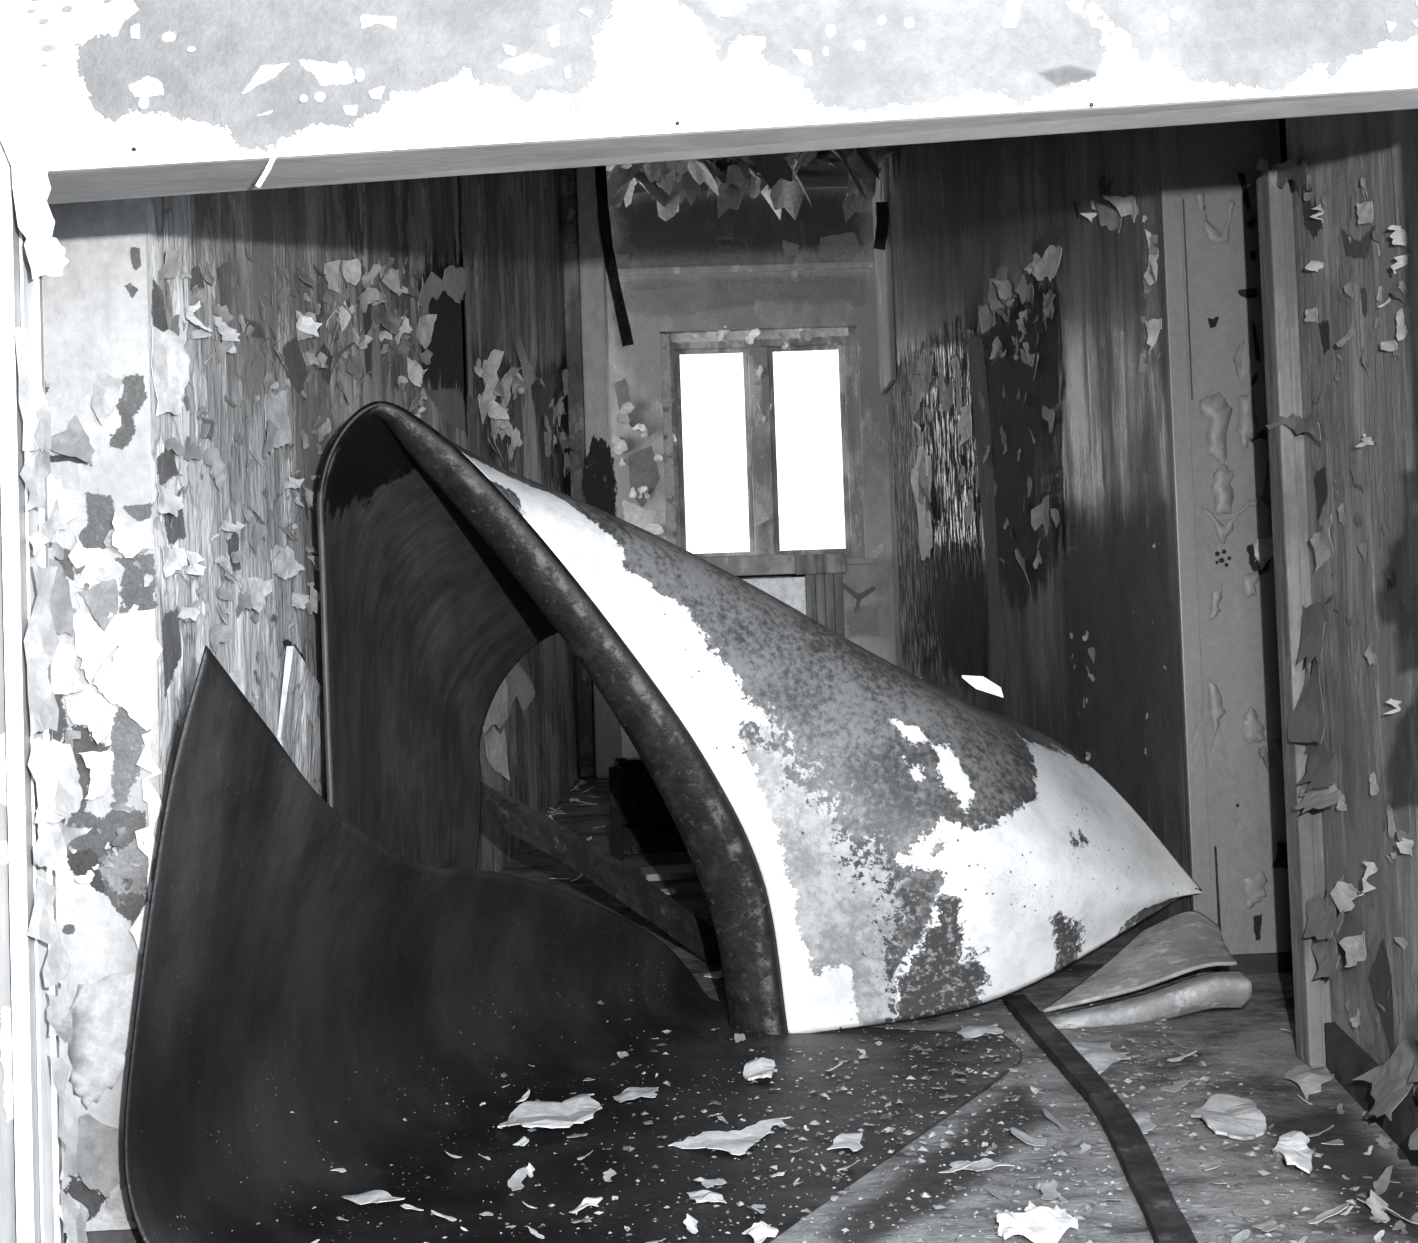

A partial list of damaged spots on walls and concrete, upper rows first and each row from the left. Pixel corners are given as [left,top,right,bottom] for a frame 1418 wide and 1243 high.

peeling [0,0,615,280]
peeling [606,147,893,258]
water stain [1044,67,1095,84]
peeling [1238,158,1339,240]
peeling [889,173,1162,701]
peeling [1233,321,1261,385]
peeling [1246,178,1412,576]
peeling [14,232,849,1243]
peeling [1259,467,1377,813]
peeling [1385,698,1402,714]
peeling [1303,772,1418,1121]
peeling [827,1132,863,1151]